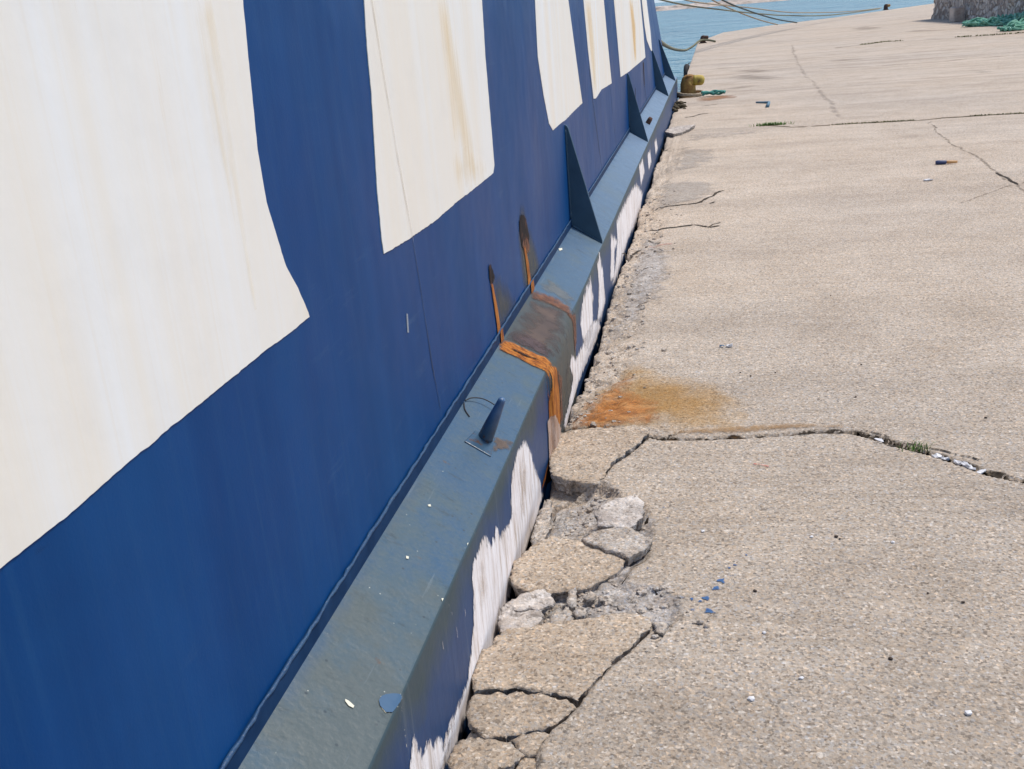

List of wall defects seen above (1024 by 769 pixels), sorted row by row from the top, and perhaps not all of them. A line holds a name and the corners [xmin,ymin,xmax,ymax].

crack [933,125,1023,203]
crack [622,190,724,273]
spalling [609,240,669,343]
rust [584,378,655,428]
crack [609,434,764,470]
rust [693,424,812,433]
crack [790,429,1024,484]
spalling [551,497,606,541]
spalling [545,556,681,625]